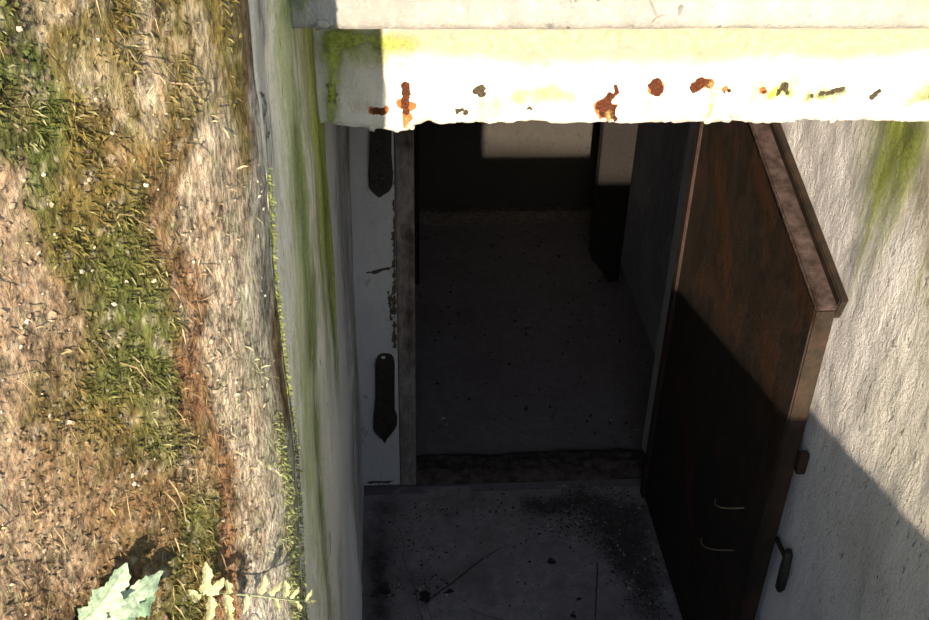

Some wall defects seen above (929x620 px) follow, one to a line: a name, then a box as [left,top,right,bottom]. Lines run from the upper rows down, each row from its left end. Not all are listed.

corrosion [368,82,416,147]
corrosion [594,85,619,122]
corrosion [648,78,665,97]
corrosion [689,77,731,116]
damp [312,28,341,372]
damp [883,128,924,217]
crack [260,91,308,620]